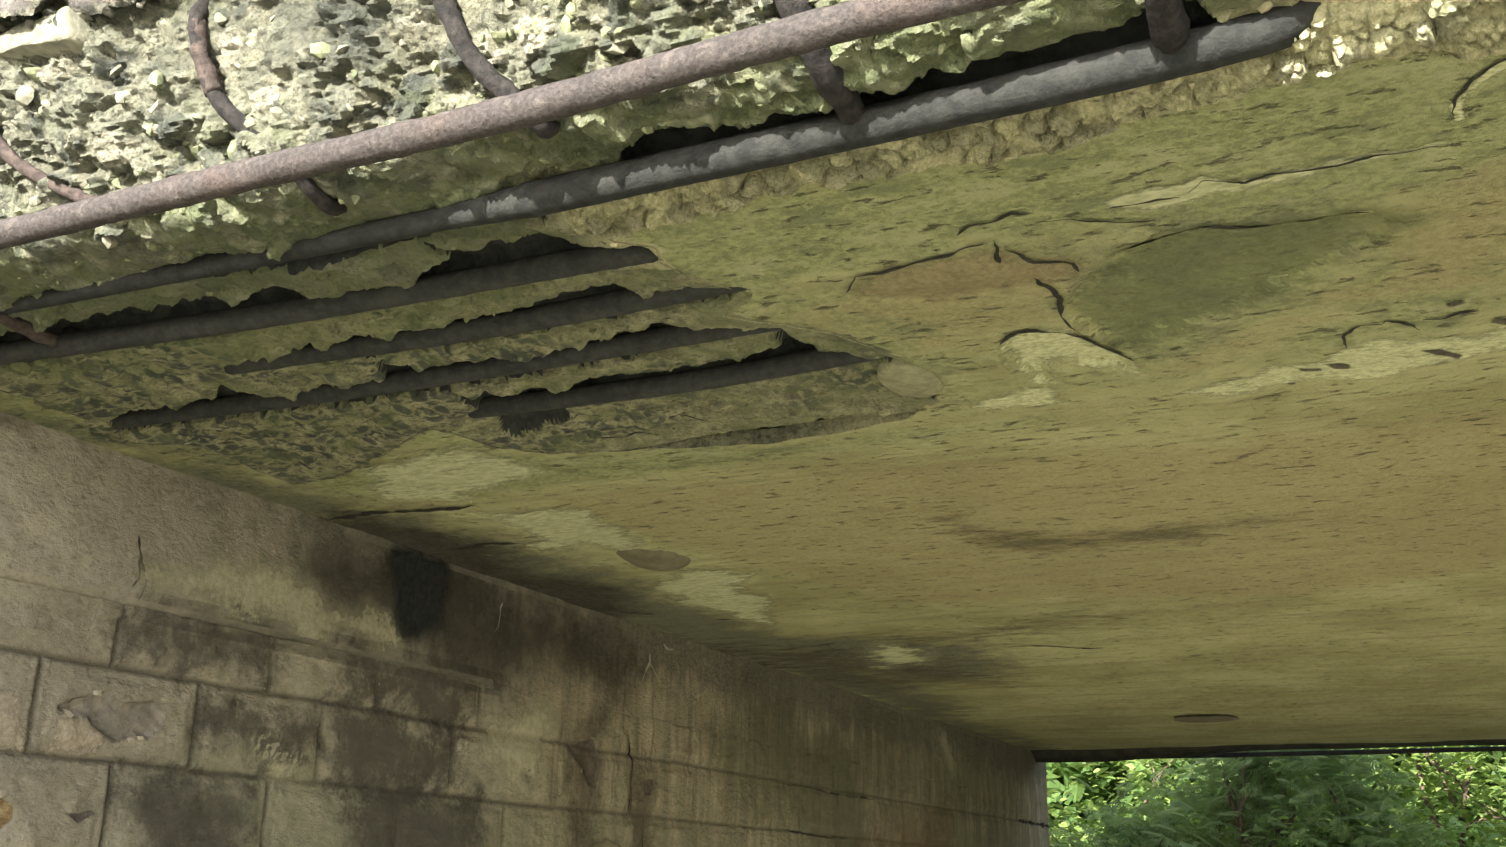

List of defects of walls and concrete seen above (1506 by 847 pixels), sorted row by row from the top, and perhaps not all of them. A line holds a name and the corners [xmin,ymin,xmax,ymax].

crack [847,58,1506,361]
spalling [0,0,1506,485]
damp [364,447,645,551]
damp [653,570,775,625]
damp [107,514,646,847]
damp [862,642,936,669]
peeling [0,691,25,749]
spalling [51,689,165,753]
spalling [0,790,13,829]